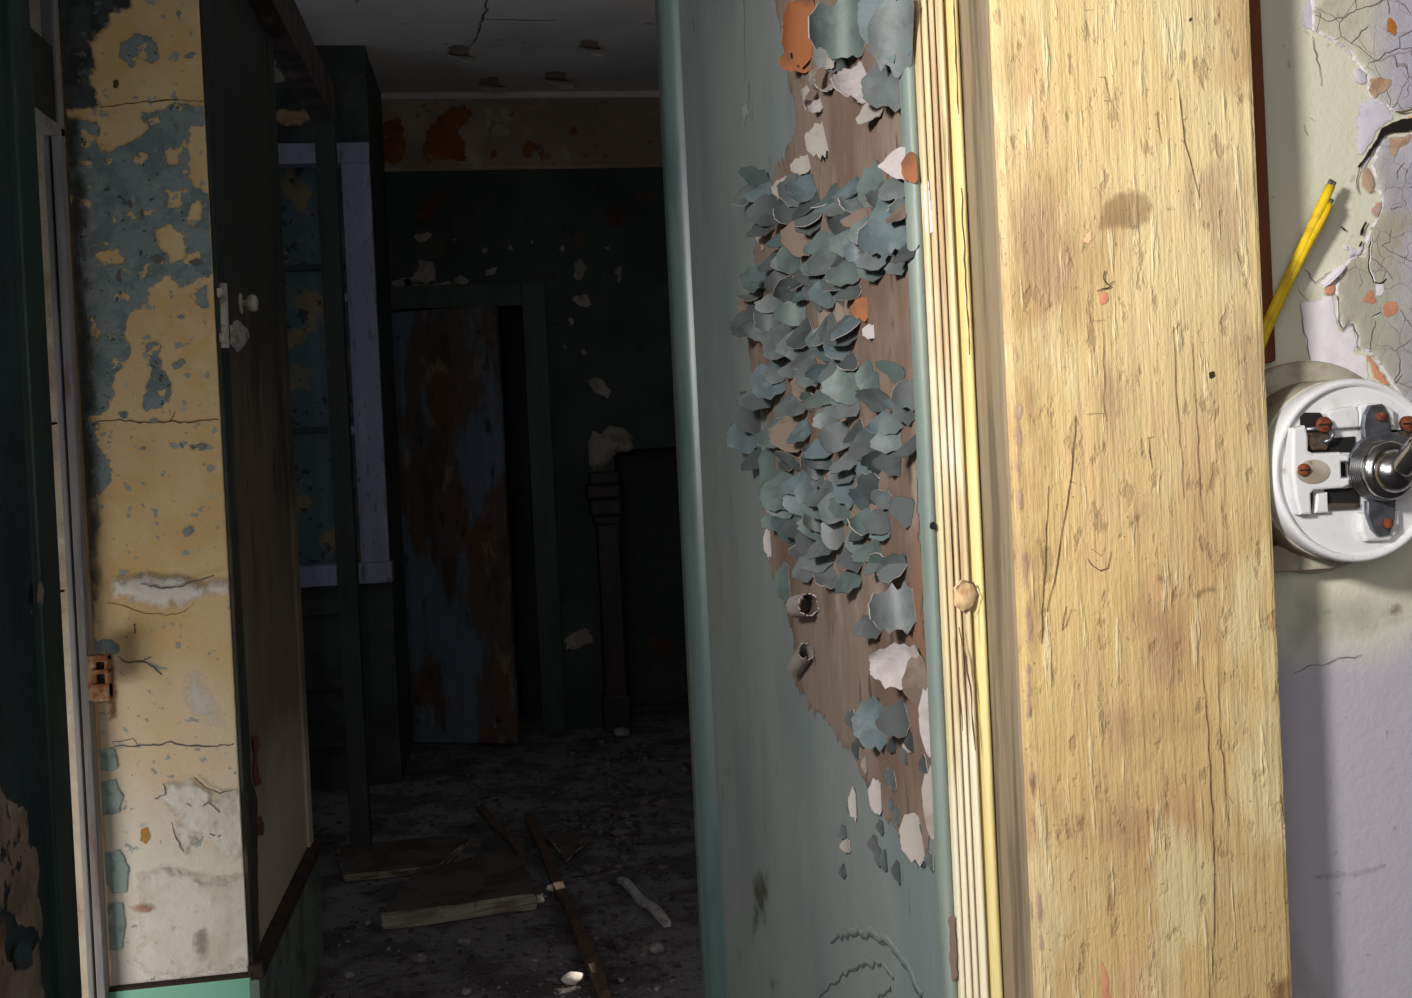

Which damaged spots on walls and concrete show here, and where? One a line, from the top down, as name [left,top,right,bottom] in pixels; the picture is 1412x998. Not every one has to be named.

peeling [119,33,159,69]
crack [470,0,555,46]
crack [100,99,207,108]
crack [1356,109,1412,195]
peeling [1300,0,1412,402]
peeling [69,103,212,498]
crack [95,413,218,423]
peeling [727,0,936,885]
peeling [99,748,124,815]
crack [110,738,234,748]
peeling [0,786,45,998]
spalling [105,735,265,977]